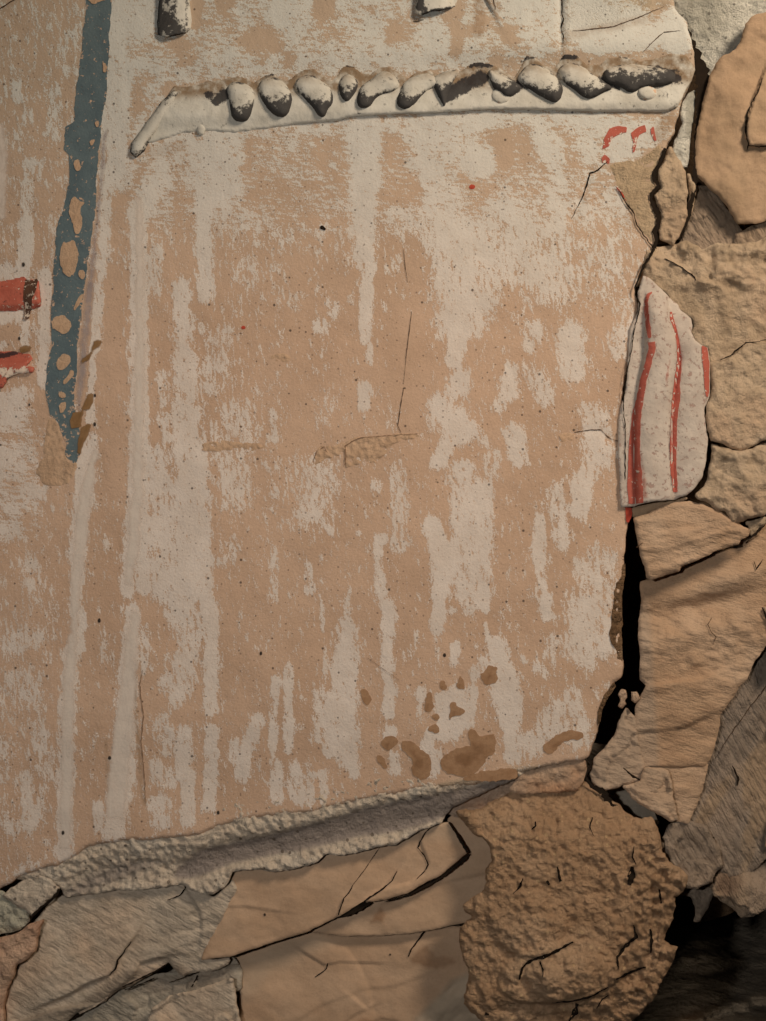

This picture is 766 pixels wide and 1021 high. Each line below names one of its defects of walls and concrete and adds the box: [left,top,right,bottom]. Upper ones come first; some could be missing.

peeling [610,75,698,247]
spalling [594,501,655,744]
crack [230,823,470,962]
spalling [655,813,671,840]
spalling [668,894,734,929]